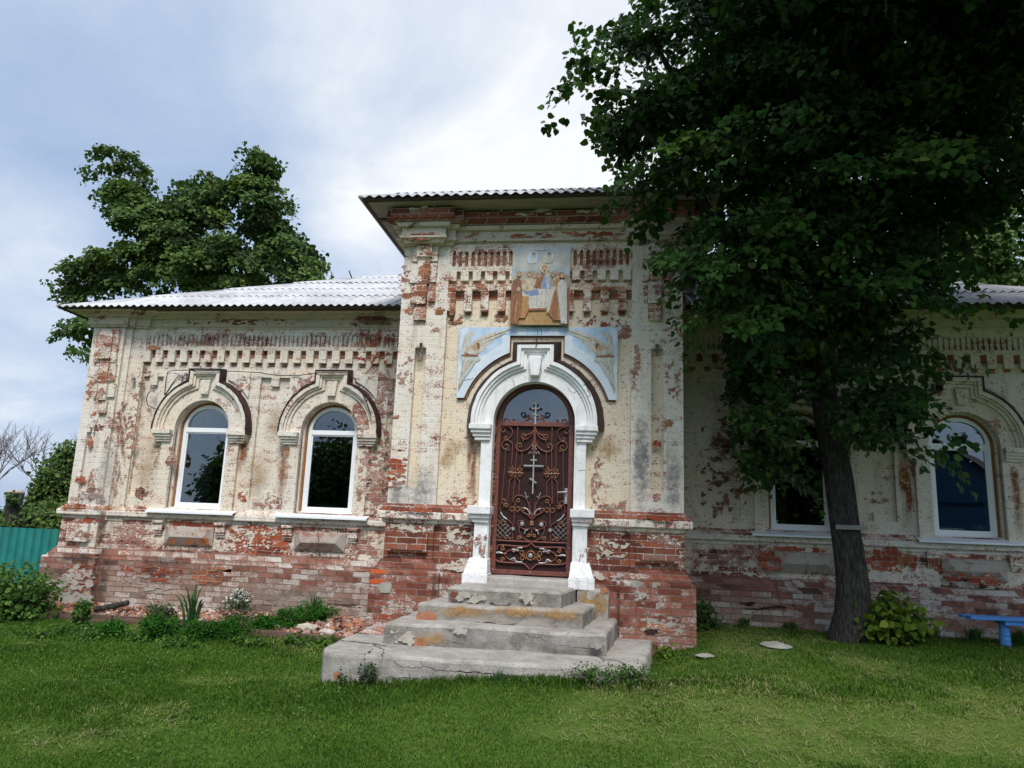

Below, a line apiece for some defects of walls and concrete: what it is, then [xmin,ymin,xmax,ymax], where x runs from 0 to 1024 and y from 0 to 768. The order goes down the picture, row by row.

peeling [430,284,508,332]
peeling [75,232,440,534]
leakage [636,430,647,491]
peeling [695,398,750,522]
peeling [74,516,100,540]
peeling [164,519,386,590]
peeling [440,522,487,558]
peeling [579,532,630,563]
peeling [636,493,681,546]
peeling [866,547,1008,588]
spalling [359,611,467,646]
crack [341,640,558,681]